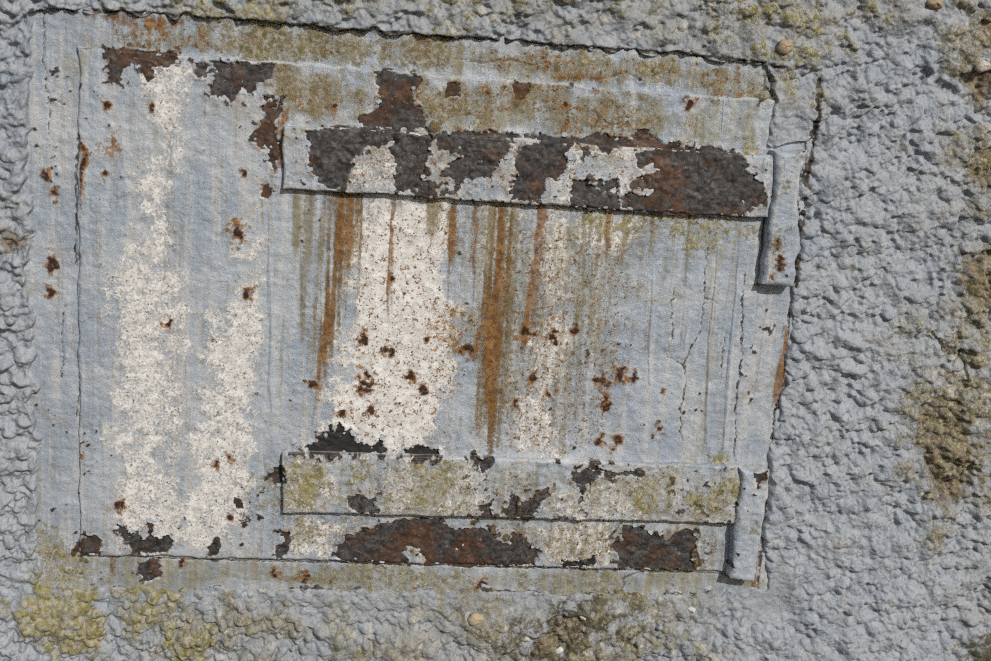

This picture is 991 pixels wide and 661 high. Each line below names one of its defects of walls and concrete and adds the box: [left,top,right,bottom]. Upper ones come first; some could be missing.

peeling [253,95,285,199]
peeling [70,47,275,581]
corrosion [292,150,654,458]
peeling [270,68,767,571]
corrosion [348,460,729,568]